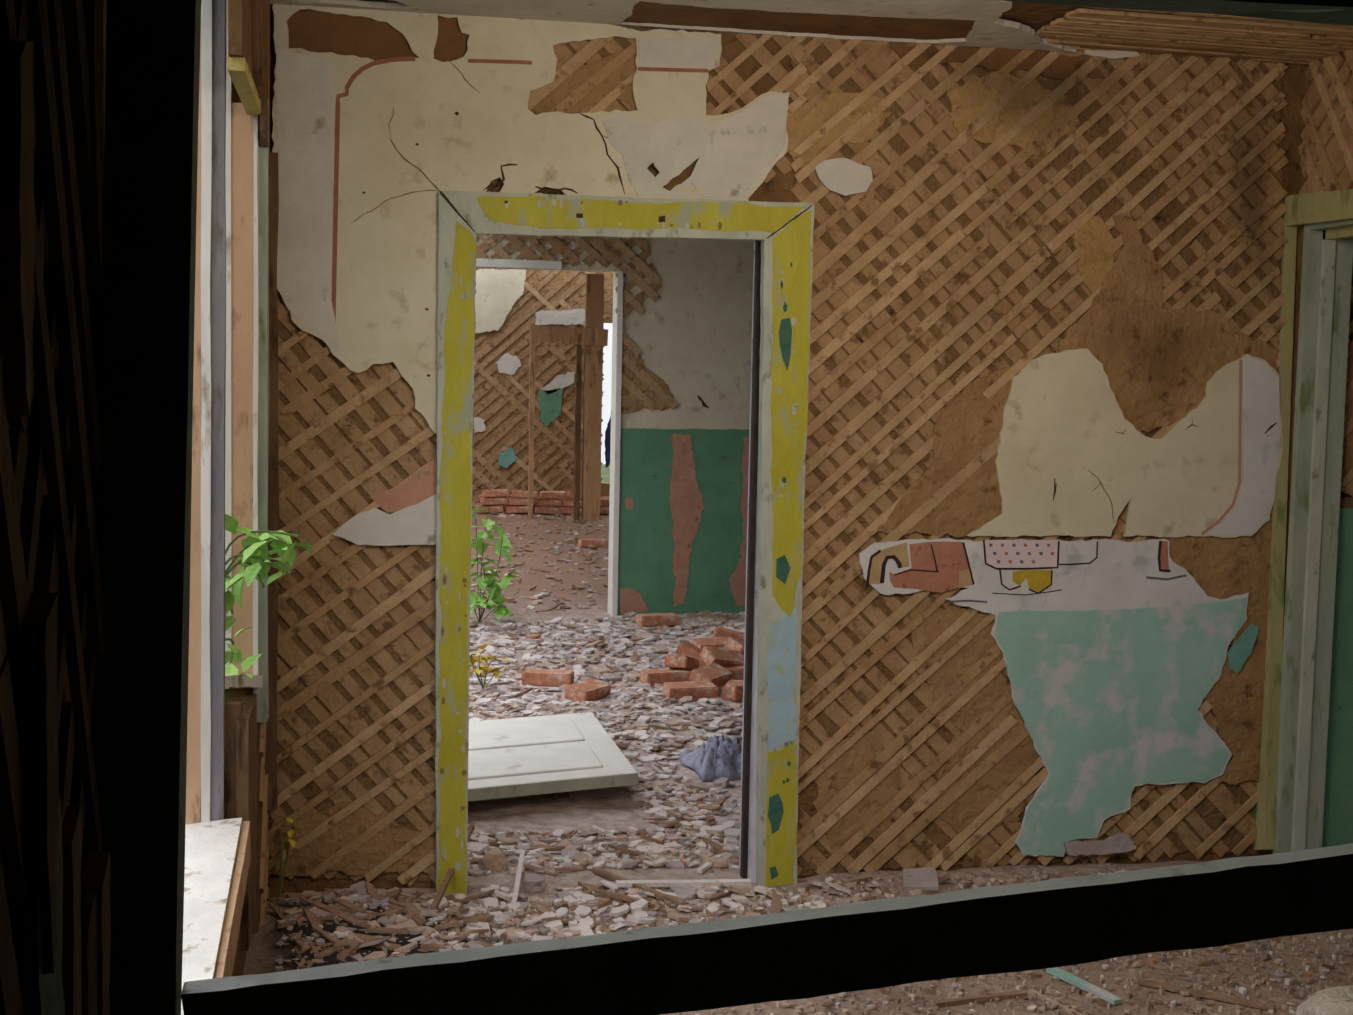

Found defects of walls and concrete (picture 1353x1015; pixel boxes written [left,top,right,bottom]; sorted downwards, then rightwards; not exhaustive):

crack [351,109,440,224]
crack [580,113,654,194]
spalling [252,0,1353,924]